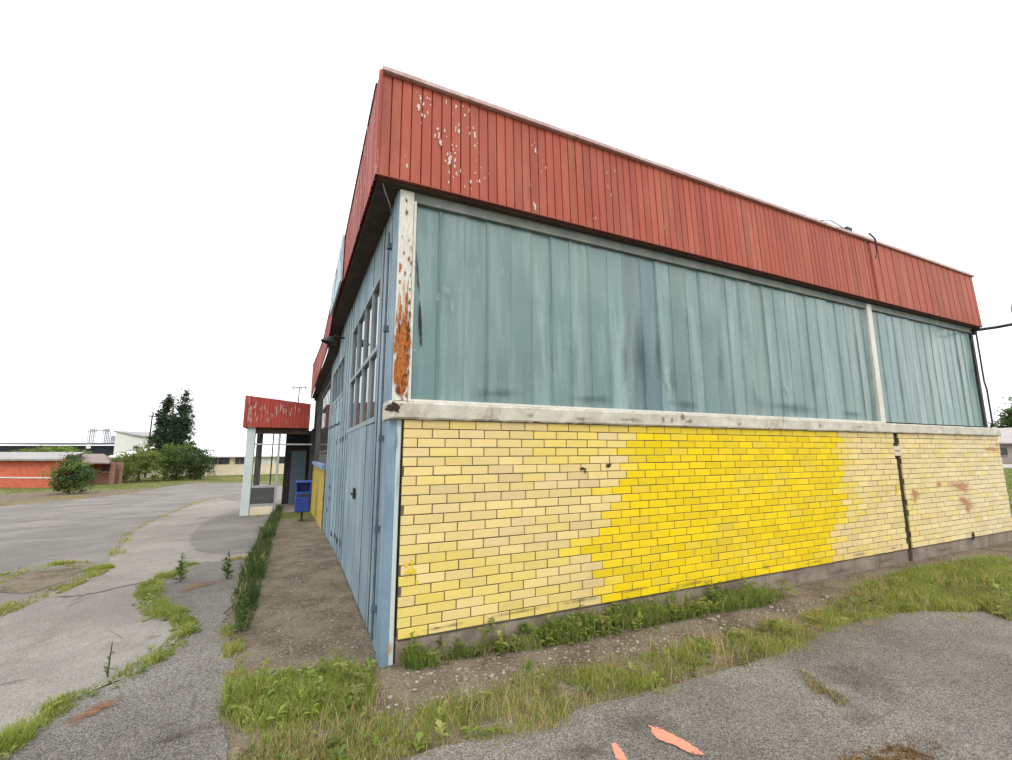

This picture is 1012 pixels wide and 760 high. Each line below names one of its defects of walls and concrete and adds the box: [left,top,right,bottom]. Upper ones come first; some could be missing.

peeling [434,95,485,190]
rust [393,236,412,401]